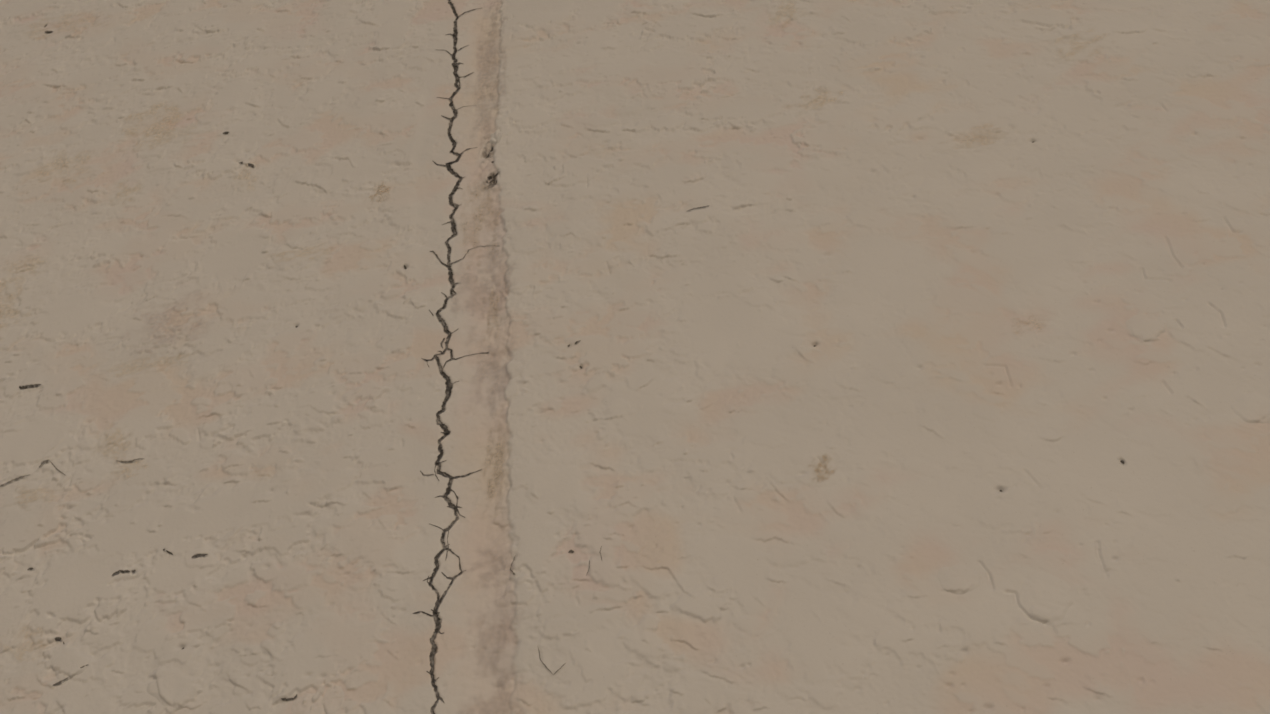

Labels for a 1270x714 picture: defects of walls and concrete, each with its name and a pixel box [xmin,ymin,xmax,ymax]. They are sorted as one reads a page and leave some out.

crack [413,0,495,714]